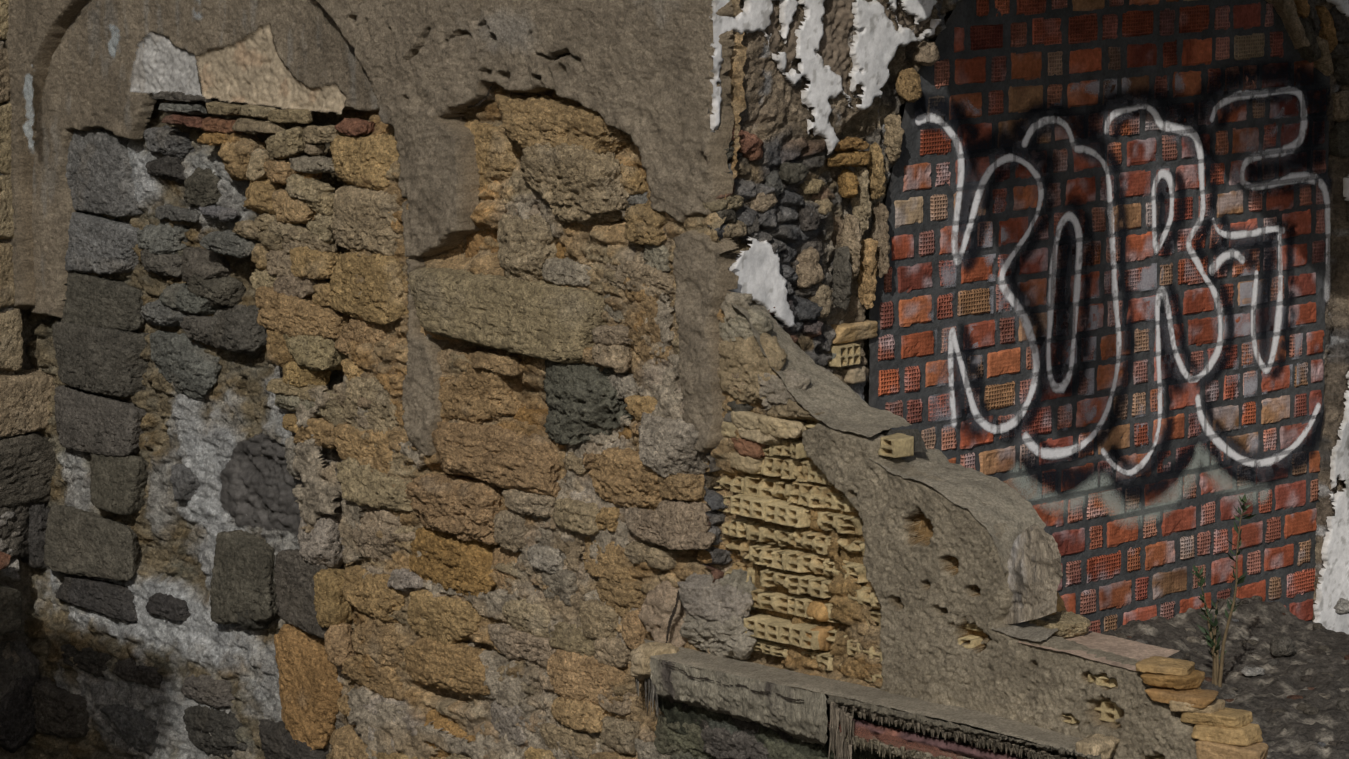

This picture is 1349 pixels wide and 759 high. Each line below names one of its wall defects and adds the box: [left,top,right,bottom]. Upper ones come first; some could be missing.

spalling [130,23,346,114]
peeling [767,1,799,72]
peeling [817,0,855,106]
peeling [872,0,932,35]
peeling [220,433,302,540]
corrosion [827,719,1027,759]